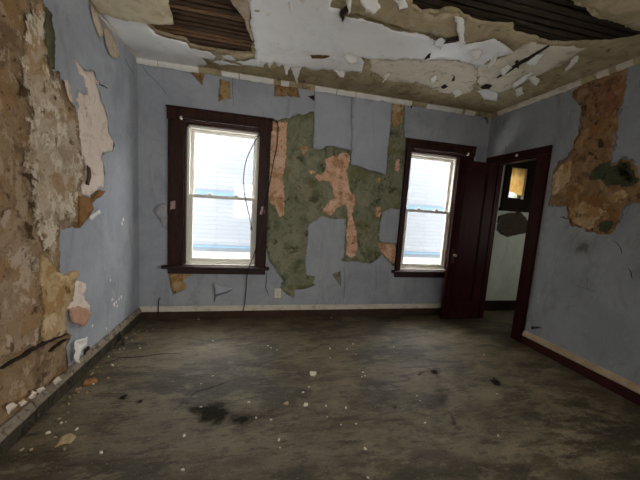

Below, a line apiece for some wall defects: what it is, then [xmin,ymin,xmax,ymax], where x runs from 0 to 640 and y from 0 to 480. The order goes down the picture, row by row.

peeling [90,0,640,101]
crack [497,45,549,79]
flaking render [0,0,115,426]
flaking render [269,121,288,217]
flaking render [309,152,358,258]
flaking render [377,243,396,263]
flaking render [548,68,640,235]